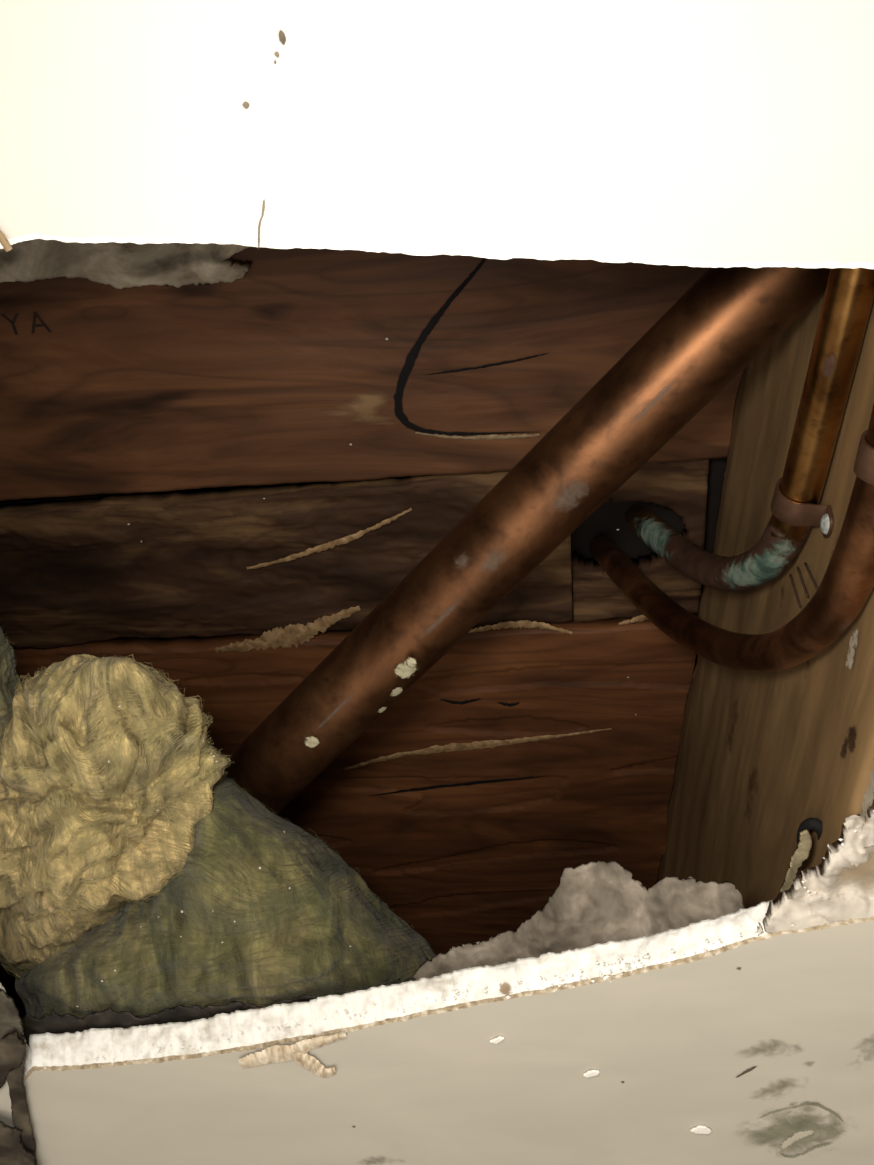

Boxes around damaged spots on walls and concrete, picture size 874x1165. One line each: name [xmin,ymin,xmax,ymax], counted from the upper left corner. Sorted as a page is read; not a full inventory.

peeling [0,231,12,252]
crack [394,258,547,440]
spalling [757,803,874,936]
peeling [583,1070,600,1078]
water stain [753,1102,842,1158]